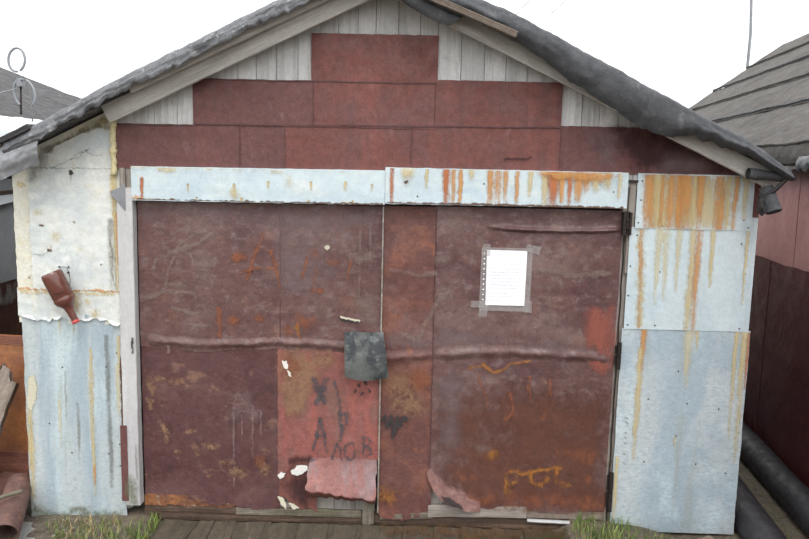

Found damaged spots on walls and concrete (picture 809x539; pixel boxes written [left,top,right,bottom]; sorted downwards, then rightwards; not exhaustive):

corrosion [131,167,623,209]
corrosion [643,174,750,374]
corrosion [633,243,647,435]
corrosion [729,332,750,426]
peeling [256,457,312,510]